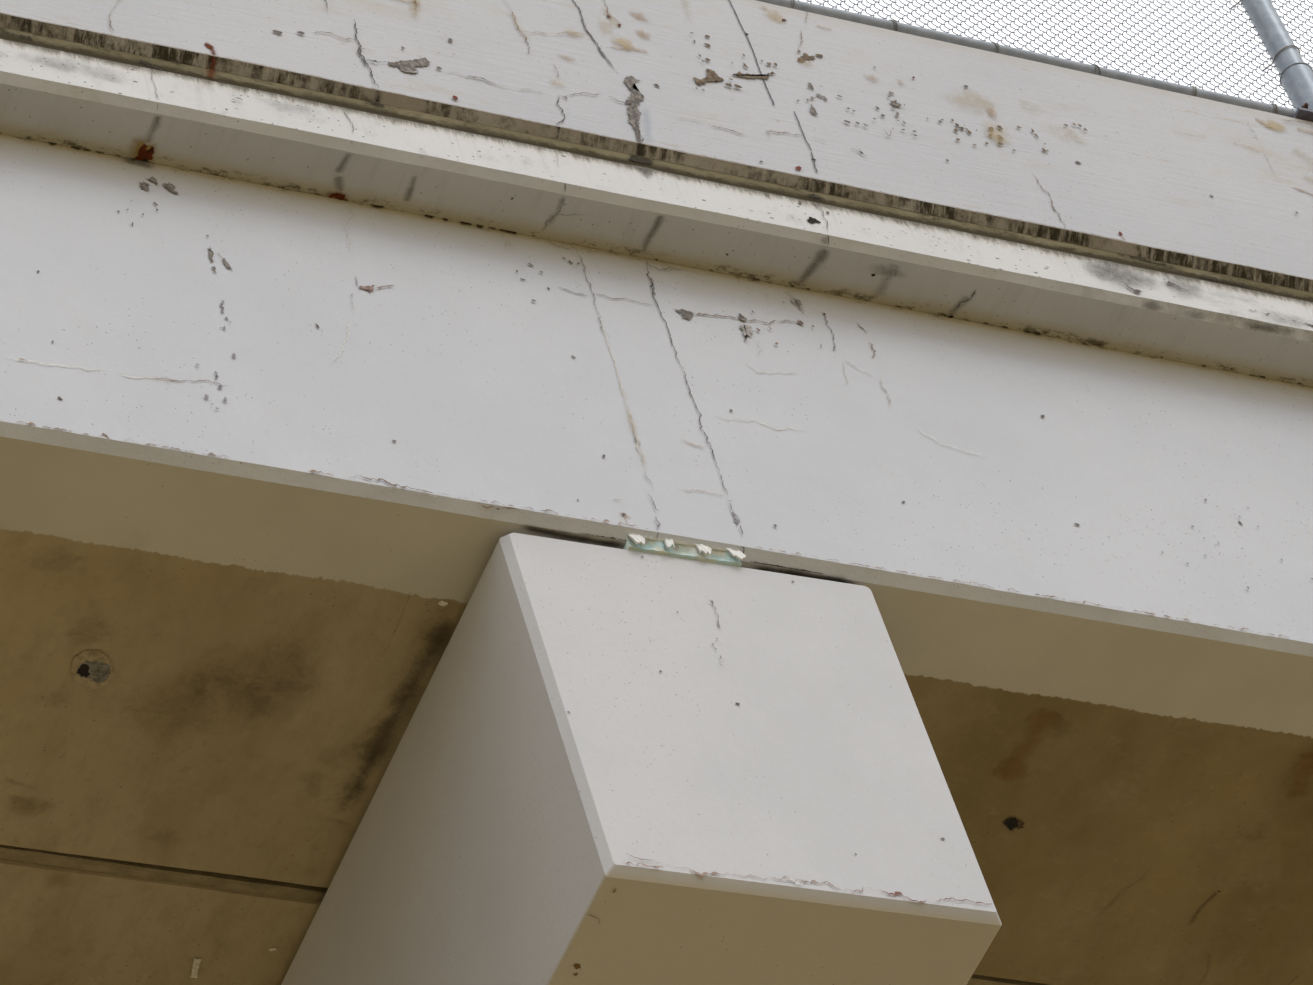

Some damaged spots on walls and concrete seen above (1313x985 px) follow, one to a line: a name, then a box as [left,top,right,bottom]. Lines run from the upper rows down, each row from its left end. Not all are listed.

crack [273,0,387,87]
peeling [388,46,442,73]
spalling [623,76,659,142]
rust [125,142,154,166]
water stain [629,144,652,174]
crack [332,108,394,362]
crack [447,0,810,554]
water stain [1104,256,1186,308]
spalling [71,650,113,689]